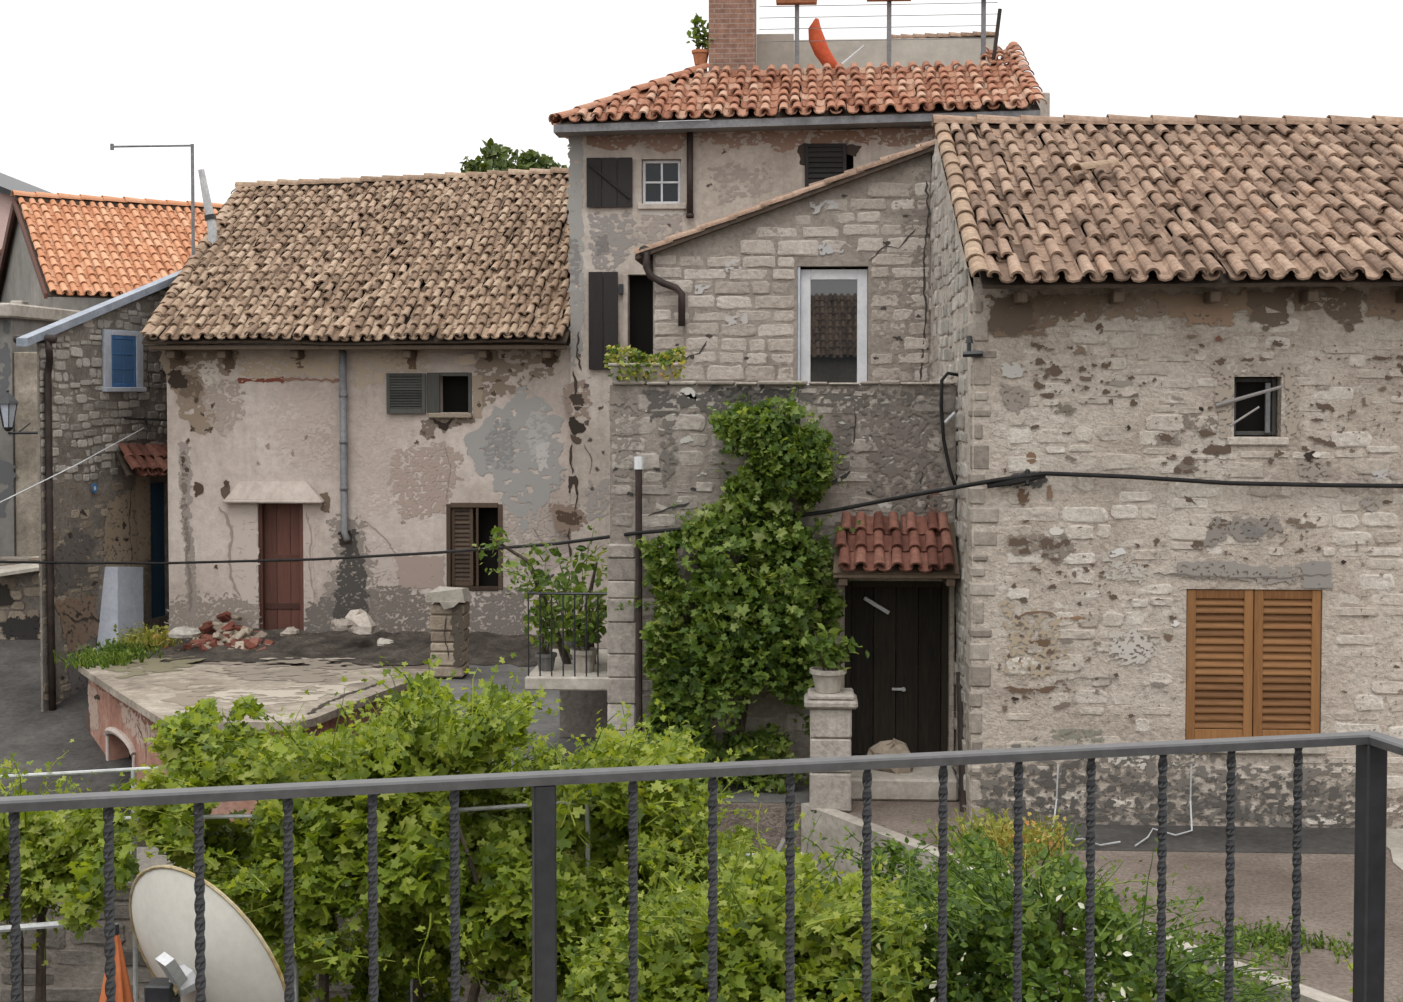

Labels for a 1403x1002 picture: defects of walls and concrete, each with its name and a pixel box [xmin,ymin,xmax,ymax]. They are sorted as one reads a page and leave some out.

spalling [159,350,306,620]
spalling [555,384,618,525]
water stain [303,513,435,634]